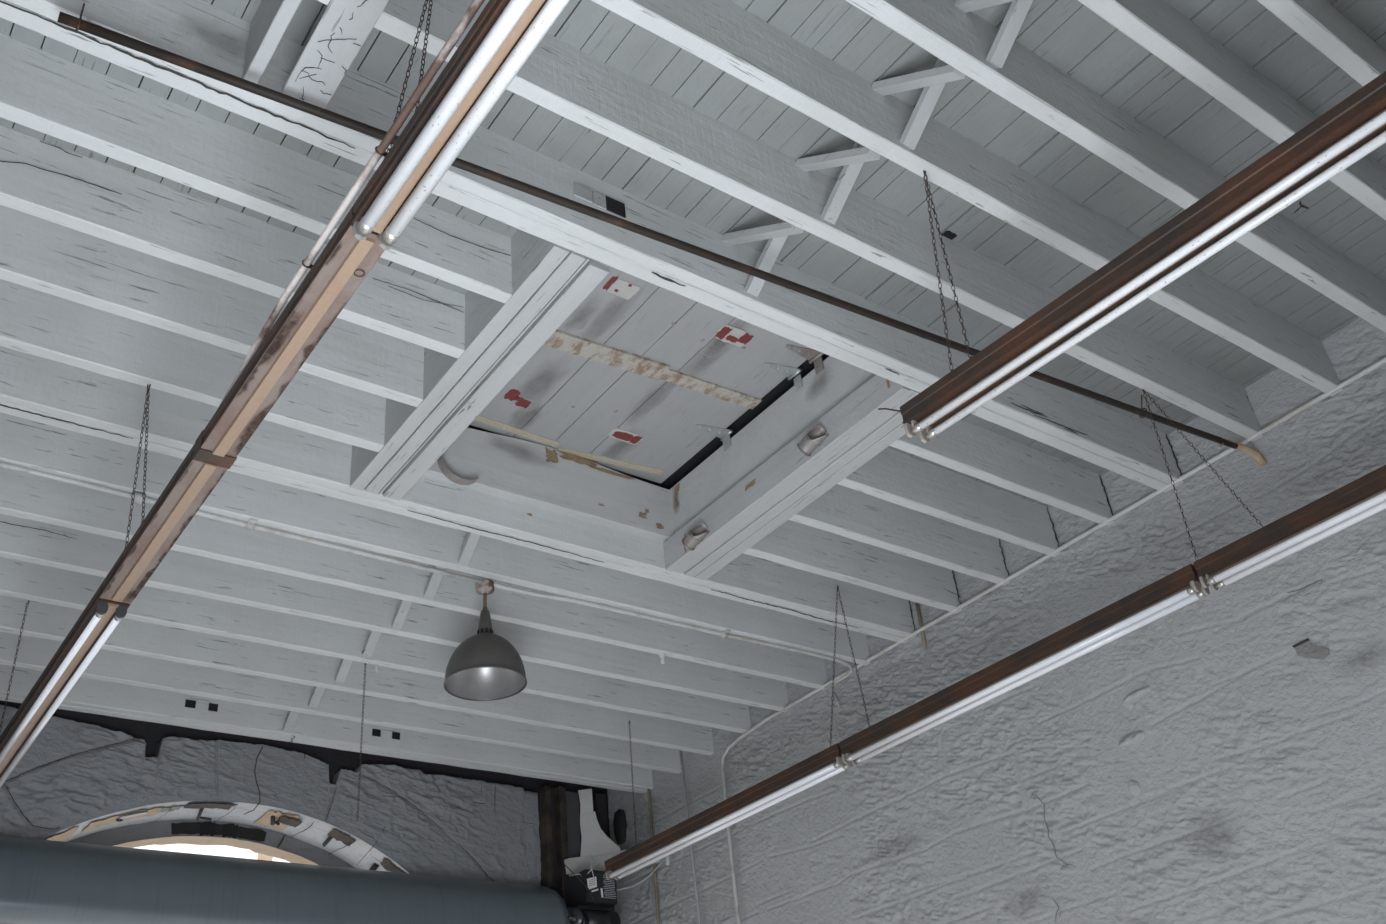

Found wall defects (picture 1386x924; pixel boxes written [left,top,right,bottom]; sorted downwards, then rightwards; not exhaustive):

crack [0,0,367,149]
peeling [714,326,754,344]
spalling [1293,638,1330,660]